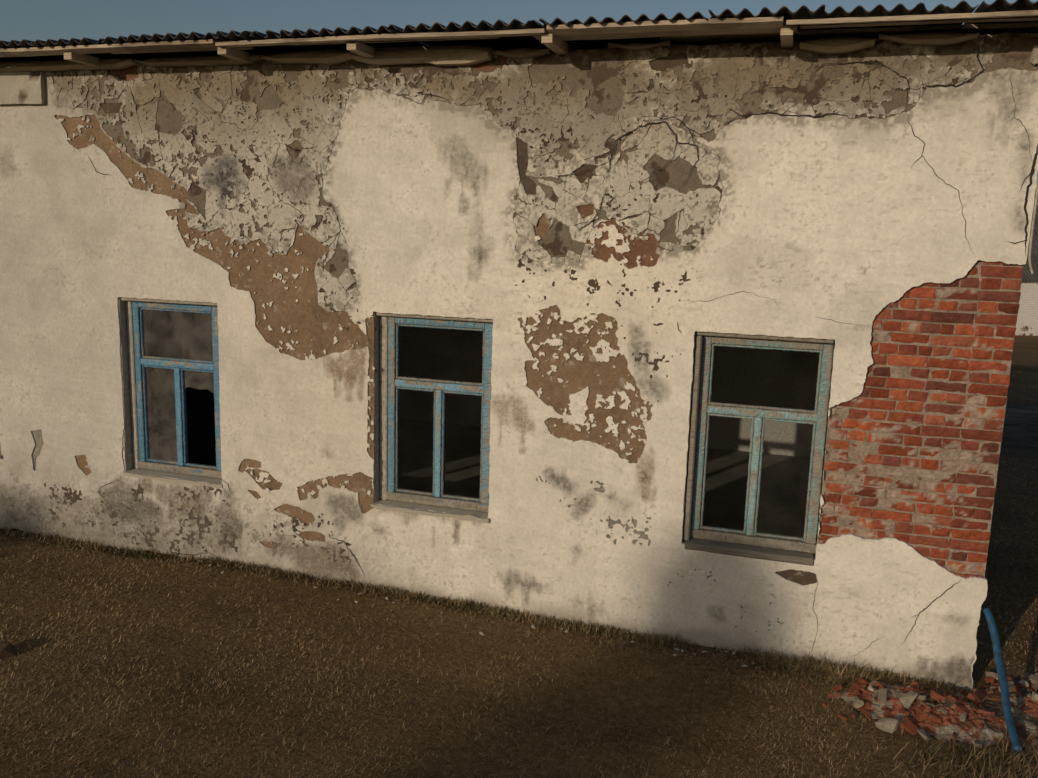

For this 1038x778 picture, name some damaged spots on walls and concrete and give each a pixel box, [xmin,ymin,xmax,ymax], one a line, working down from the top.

peeling [51,33,1038,463]
crack [552,108,854,232]
crack [809,45,984,250]
crack [1007,81,1038,254]
spalling [818,260,1023,578]
peeling [239,457,374,563]
crack [854,583,957,656]